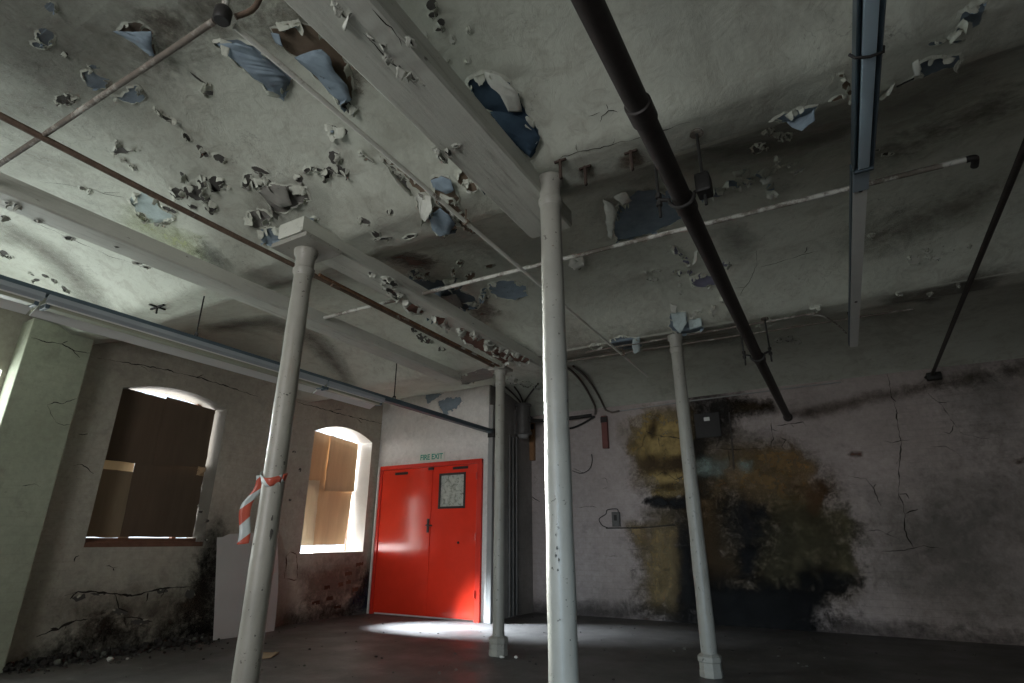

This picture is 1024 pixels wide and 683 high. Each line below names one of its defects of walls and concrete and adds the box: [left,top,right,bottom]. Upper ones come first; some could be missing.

peeling [52,19,360,247]
peeling [465,70,542,160]
peeling [749,71,852,155]
peeling [0,200,23,222]
peeling [603,188,682,243]
crack [35,338,254,396]
peeling [367,260,543,415]
water stain [734,400,774,414]
crack [852,378,941,552]
water stain [577,410,893,634]
crack [37,565,191,637]
water stain [37,522,221,657]